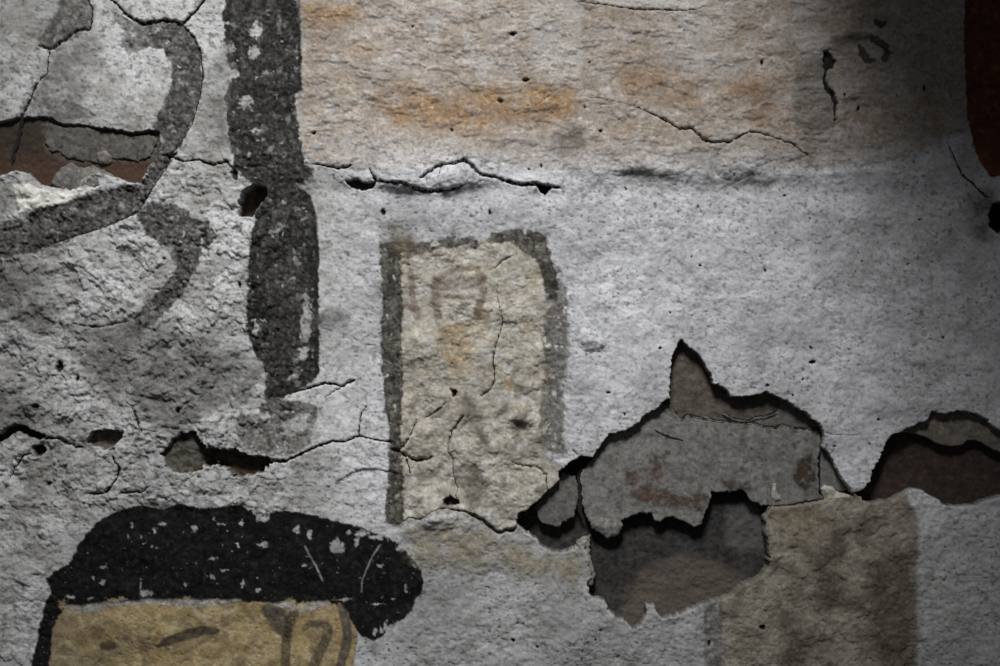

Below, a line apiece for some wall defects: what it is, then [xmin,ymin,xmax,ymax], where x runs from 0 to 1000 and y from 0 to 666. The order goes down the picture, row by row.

flaking render [0,118,161,191]
crack [11,0,232,250]
crack [315,159,560,193]
crack [589,97,811,158]
crack [483,255,513,396]
crack [270,380,354,398]
flaking render [161,431,274,476]
crack [271,404,517,533]
flaking render [517,341,1000,626]